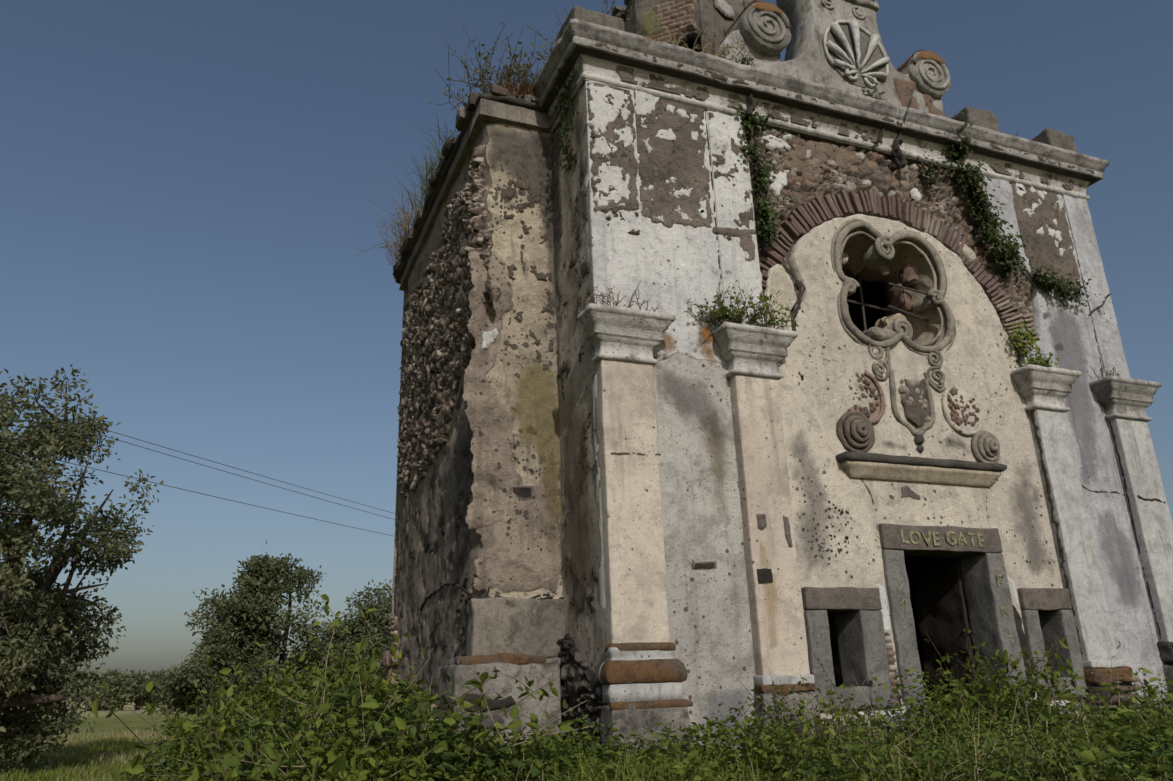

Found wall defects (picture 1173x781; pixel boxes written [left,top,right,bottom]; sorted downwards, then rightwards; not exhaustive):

spalling [388,65,1095,679]
crack [420,572,596,629]
crack [1030,410,1083,655]
leakage [1105,519,1135,601]
crack [1082,420,1165,639]